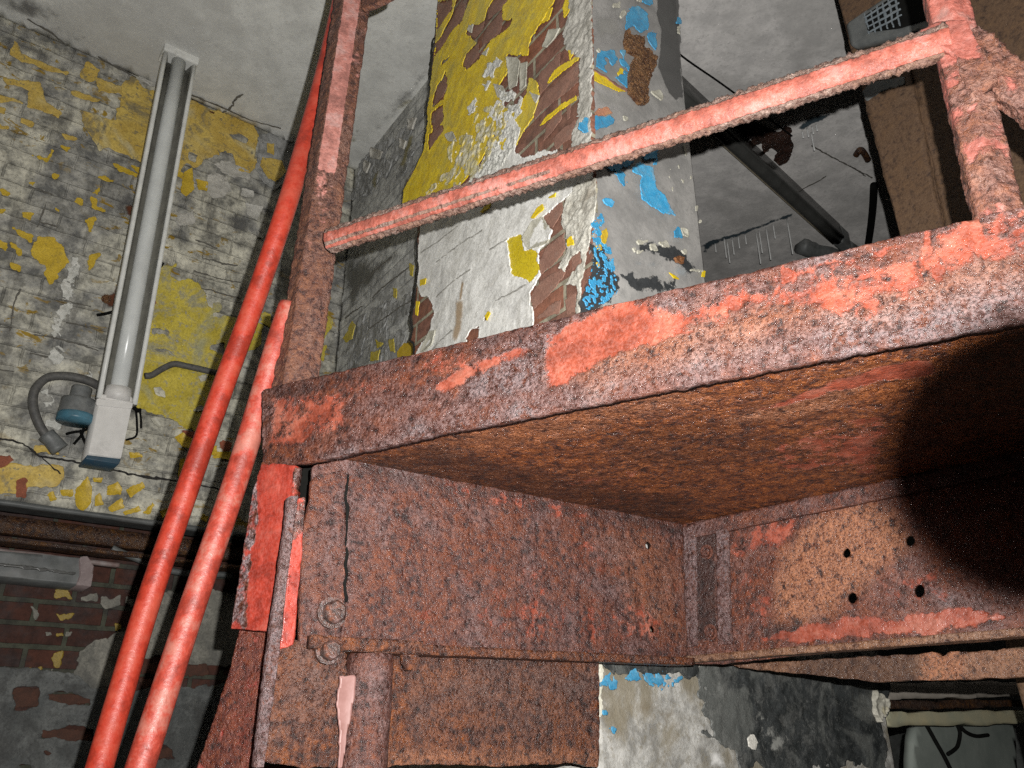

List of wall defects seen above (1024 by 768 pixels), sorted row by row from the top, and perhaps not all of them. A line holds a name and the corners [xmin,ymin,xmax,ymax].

crack [0,438,81,474]
peeling [10,41,155,232]
crack [112,469,219,490]
peeling [136,263,237,477]
peeling [175,100,295,239]
rust [453,283,463,339]
peeling [338,172,618,372]
peeling [350,0,630,203]
peeling [607,143,702,255]
flaking render [0,623,125,768]
flaking render [114,589,184,768]
flaking render [156,589,239,768]